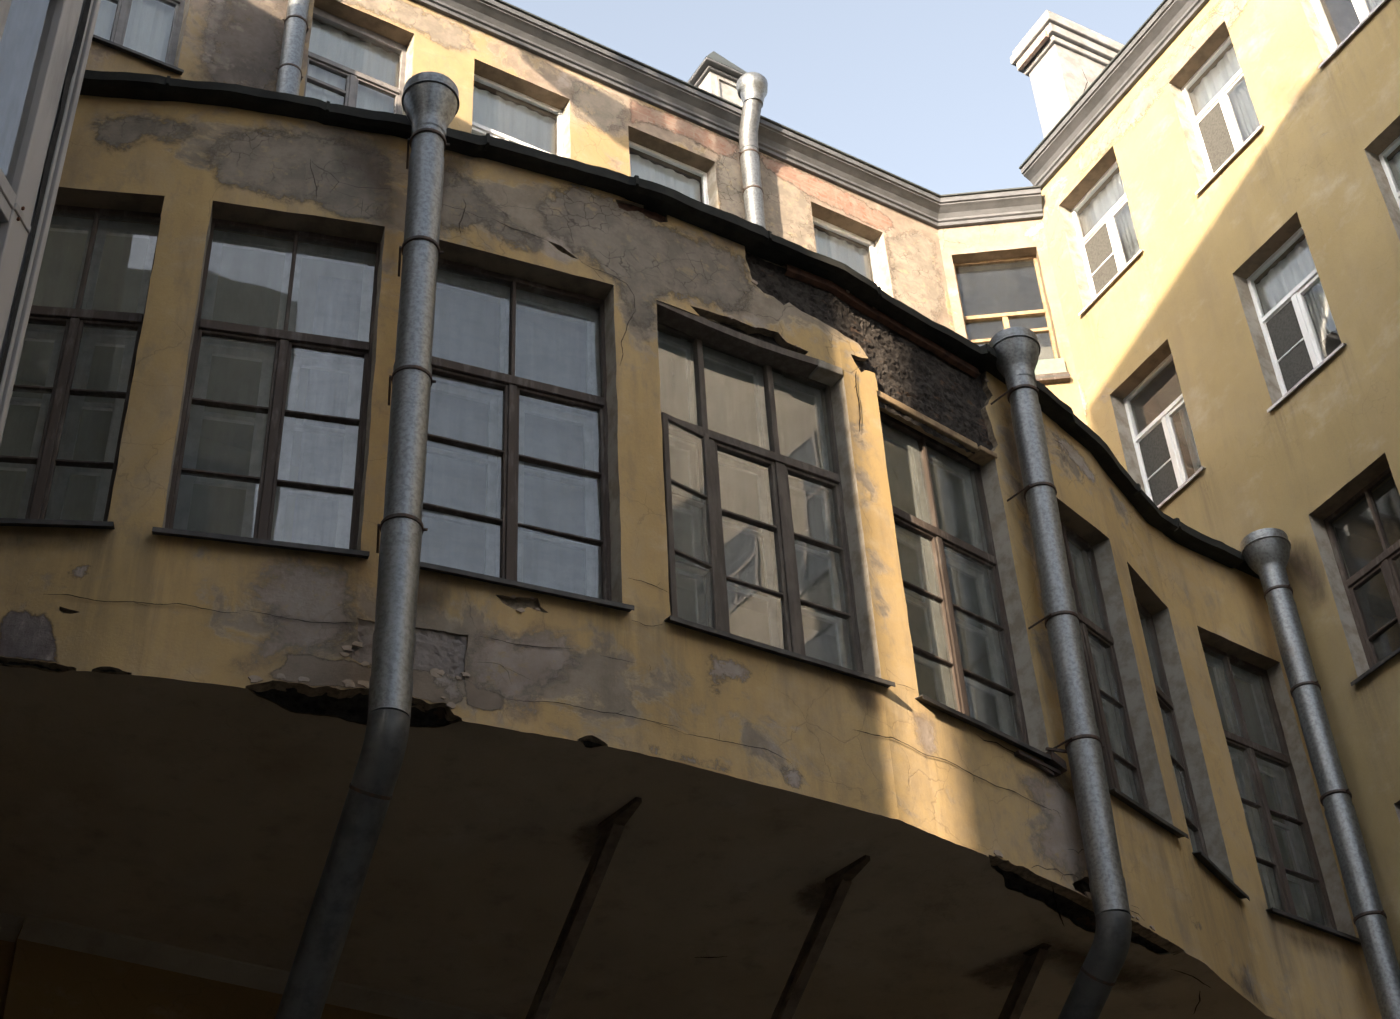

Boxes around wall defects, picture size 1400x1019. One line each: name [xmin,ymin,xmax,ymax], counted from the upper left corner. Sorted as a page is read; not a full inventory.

water stain [200,0,288,90]
peeling [207,128,391,219]
flaking render [572,81,746,220]
crack [443,201,548,241]
crack [580,260,636,364]
flaking render [440,153,993,454]
crack [854,371,862,432]
flaking render [0,610,68,671]
crack [48,594,352,624]
peeling [248,558,375,723]
peeling [410,629,580,726]
crack [856,730,1060,813]